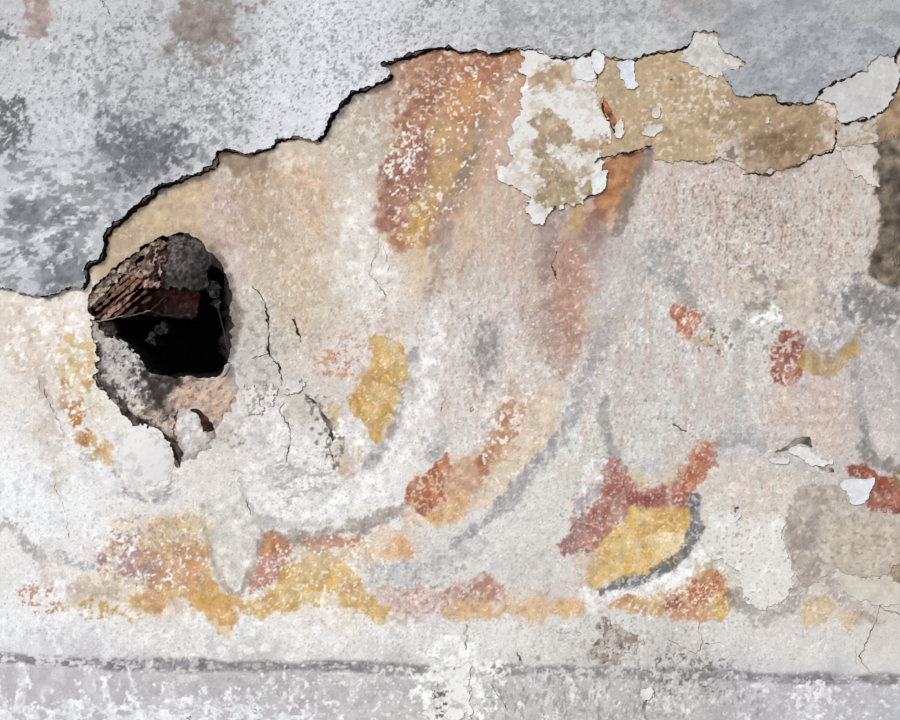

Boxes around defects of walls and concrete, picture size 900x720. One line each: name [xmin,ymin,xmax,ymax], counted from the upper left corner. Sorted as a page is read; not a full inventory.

flaking render [497,30,900,225]
spalling [82,232,305,468]
crack [252,286,291,464]
crack [305,394,334,461]
peeling [769,436,834,472]